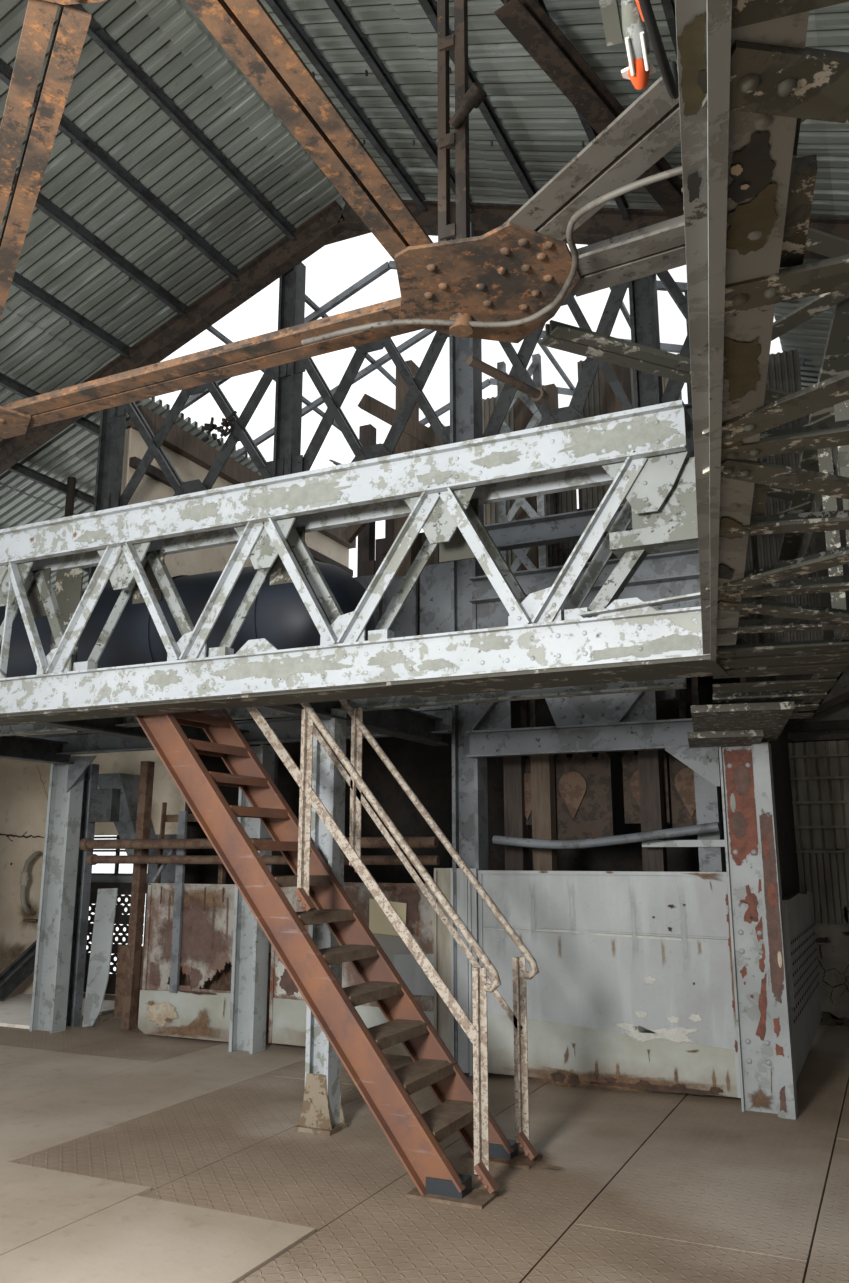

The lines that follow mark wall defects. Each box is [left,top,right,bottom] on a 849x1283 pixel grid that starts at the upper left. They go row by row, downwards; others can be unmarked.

peeling [677,11,707,116]
peeling [726,131,779,255]
peeling [723,337,761,401]
peeling [560,418,679,458]
peeling [471,449,521,468]
peeling [244,482,356,511]
peeling [146,669,181,688]
peeling [210,651,453,681]
peeling [470,634,513,652]
peeling [587,633,702,662]
peeling [723,747,784,1057]
rust [528,1044,730,1096]